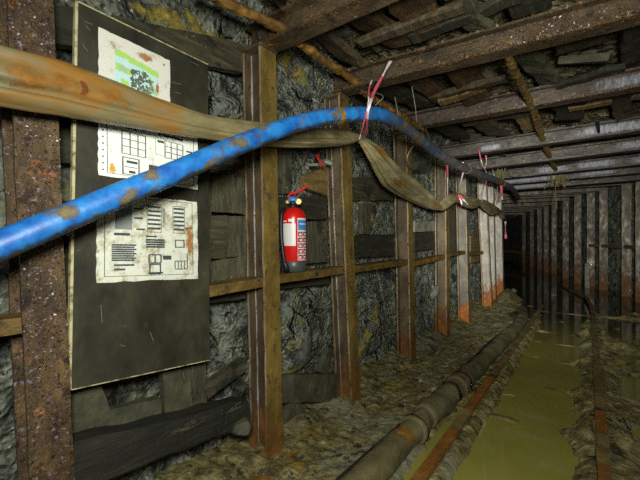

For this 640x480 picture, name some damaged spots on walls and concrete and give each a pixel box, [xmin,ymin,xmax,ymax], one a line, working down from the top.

corrosion [14,110,62,219]
corrosion [19,237,73,480]
corrosion [458,300,471,323]
corrosion [481,276,504,307]